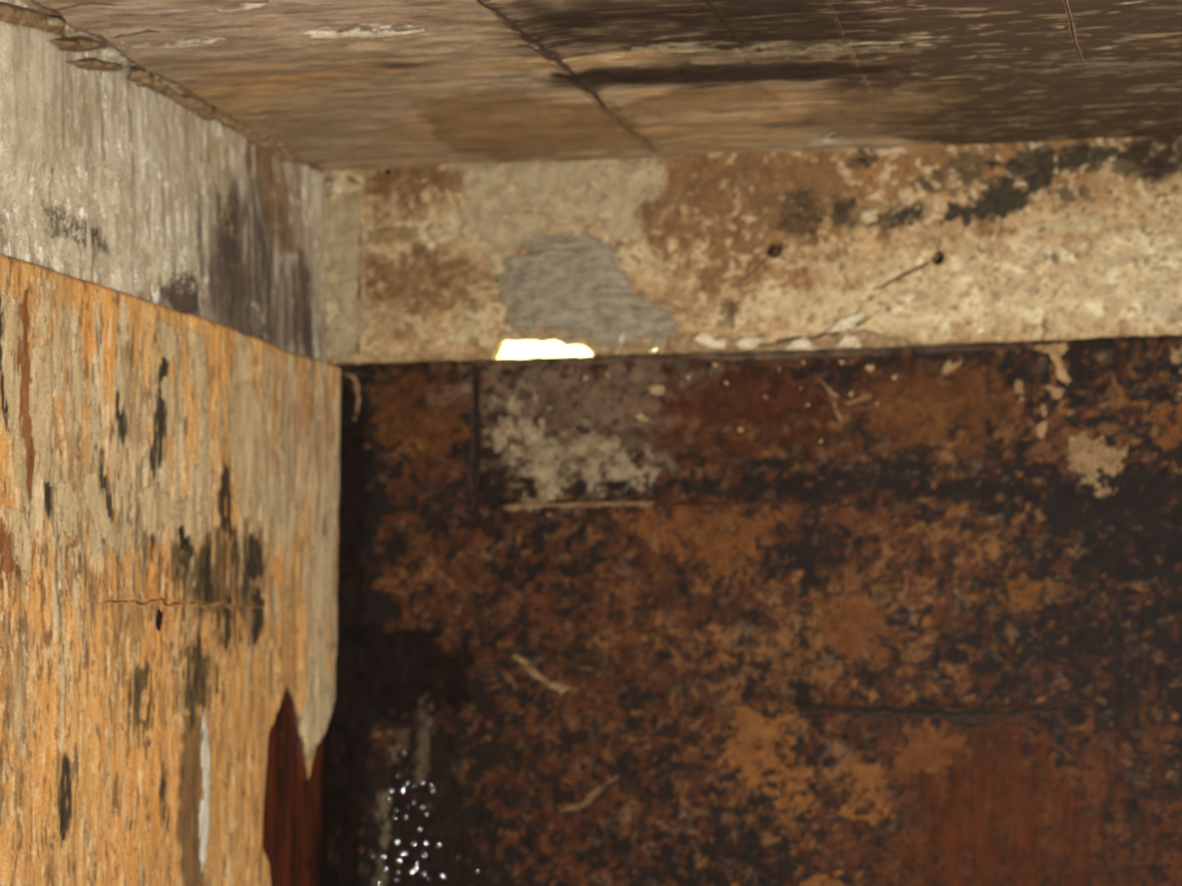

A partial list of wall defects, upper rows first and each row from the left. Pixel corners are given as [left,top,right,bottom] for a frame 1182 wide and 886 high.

crack [1063,0,1085,65]
crack [477,0,656,152]
mould [776,189,856,234]
mould [886,205,922,226]
mould [939,141,1124,227]
spalling [665,312,917,354]
corrosion [17,289,35,501]
corrosion [0,518,20,589]
water stain [150,462,265,651]
crack [98,596,263,609]
water stain [160,638,218,886]